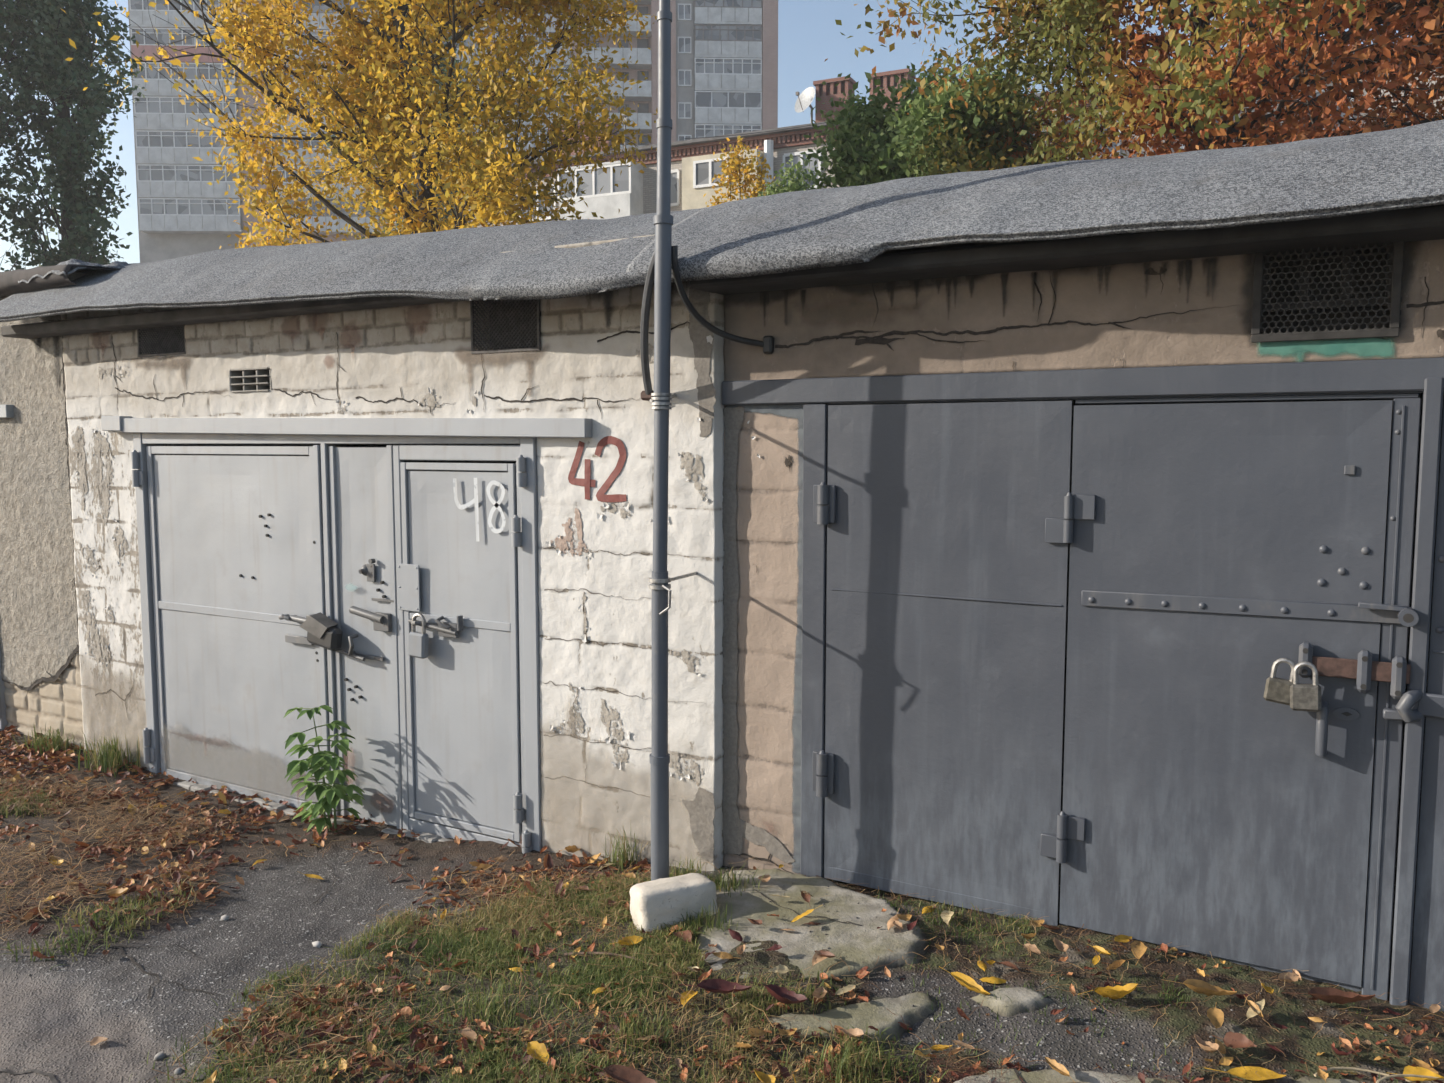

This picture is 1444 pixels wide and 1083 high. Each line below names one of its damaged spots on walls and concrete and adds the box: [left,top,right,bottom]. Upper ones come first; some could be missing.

damp [882,244,976,254]
damp [726,288,805,325]
damp [838,274,1007,312]
crack [775,272,1234,351]
crack [1406,277,1444,333]
crack [274,332,639,416]
crack [4,336,79,704]
peeling [75,426,128,565]
flaking render [4,543,115,750]
peeling [550,683,584,734]
peeling [600,699,630,770]
peeling [668,750,704,786]